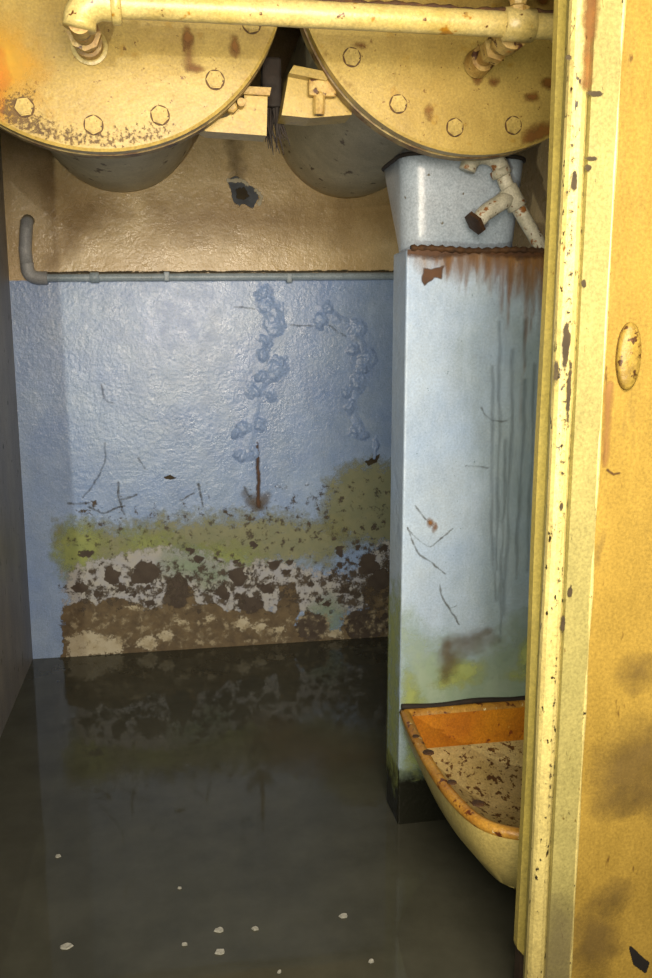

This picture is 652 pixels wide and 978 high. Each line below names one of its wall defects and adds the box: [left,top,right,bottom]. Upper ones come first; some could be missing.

rust [583,0,598,88]
spalling [227,176,263,208]
rust [407,244,545,290]
spalling [58,538,390,657]